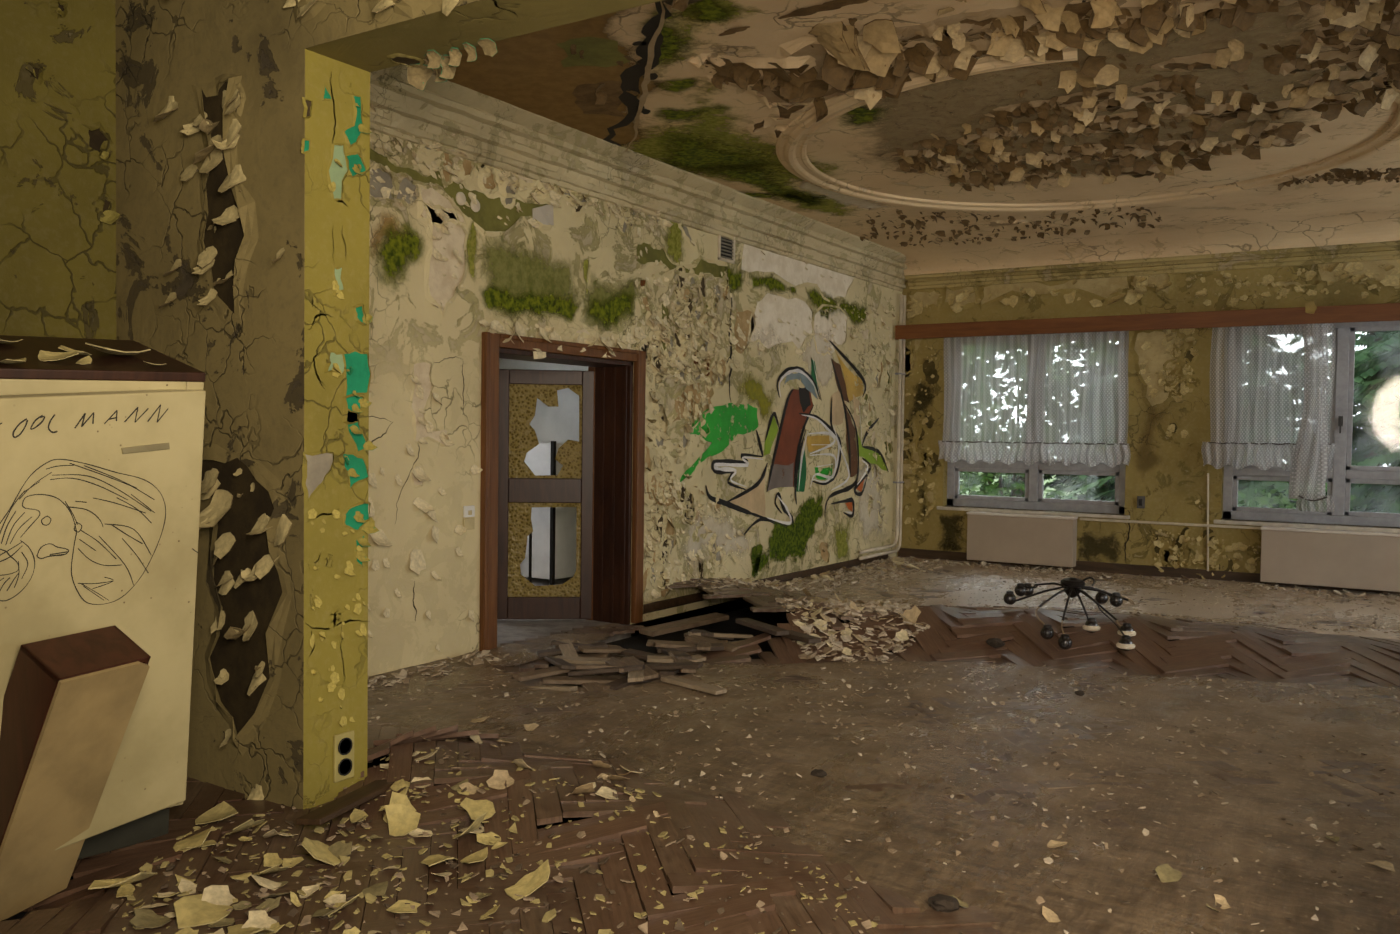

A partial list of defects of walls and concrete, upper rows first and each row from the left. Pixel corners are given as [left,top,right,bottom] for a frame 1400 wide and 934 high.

peeling [386,38,497,91]
flaking render [302,84,333,119]
peeling [685,0,1400,191]
peeling [301,138,311,154]
leakage [803,183,881,208]
peeling [327,94,1400,603]
leakage [917,484,962,550]
peeling [199,349,467,756]
mould [1079,532,1121,562]